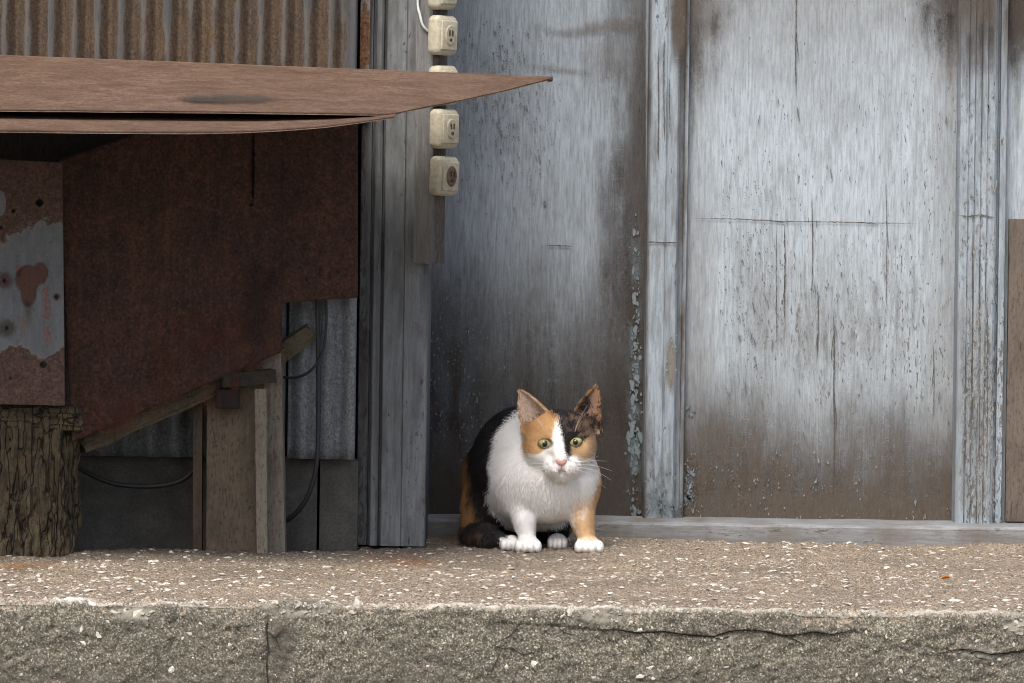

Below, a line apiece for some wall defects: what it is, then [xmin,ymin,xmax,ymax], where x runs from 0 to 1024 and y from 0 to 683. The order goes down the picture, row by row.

corrosion [186,94,270,102]
peeling [624,213,832,518]
peeling [718,153,829,439]
crack [698,189,920,488]
leakage [683,408,952,521]
crack [490,626,533,674]
crack [557,625,848,647]
crack [940,649,1024,660]